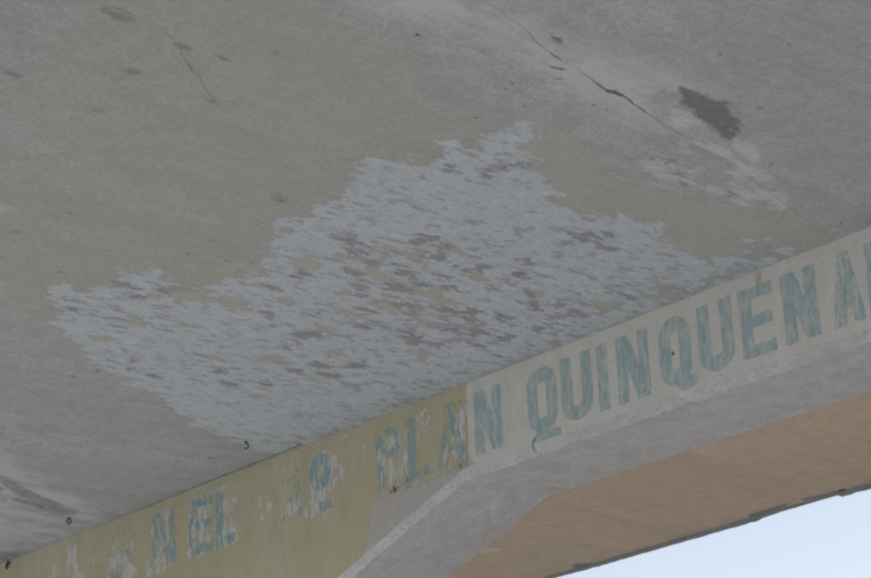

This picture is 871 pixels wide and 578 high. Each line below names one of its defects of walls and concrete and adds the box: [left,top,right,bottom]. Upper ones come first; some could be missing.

water stain [0,0,846,322]
crack [482,0,680,134]
peeling [42,118,806,559]